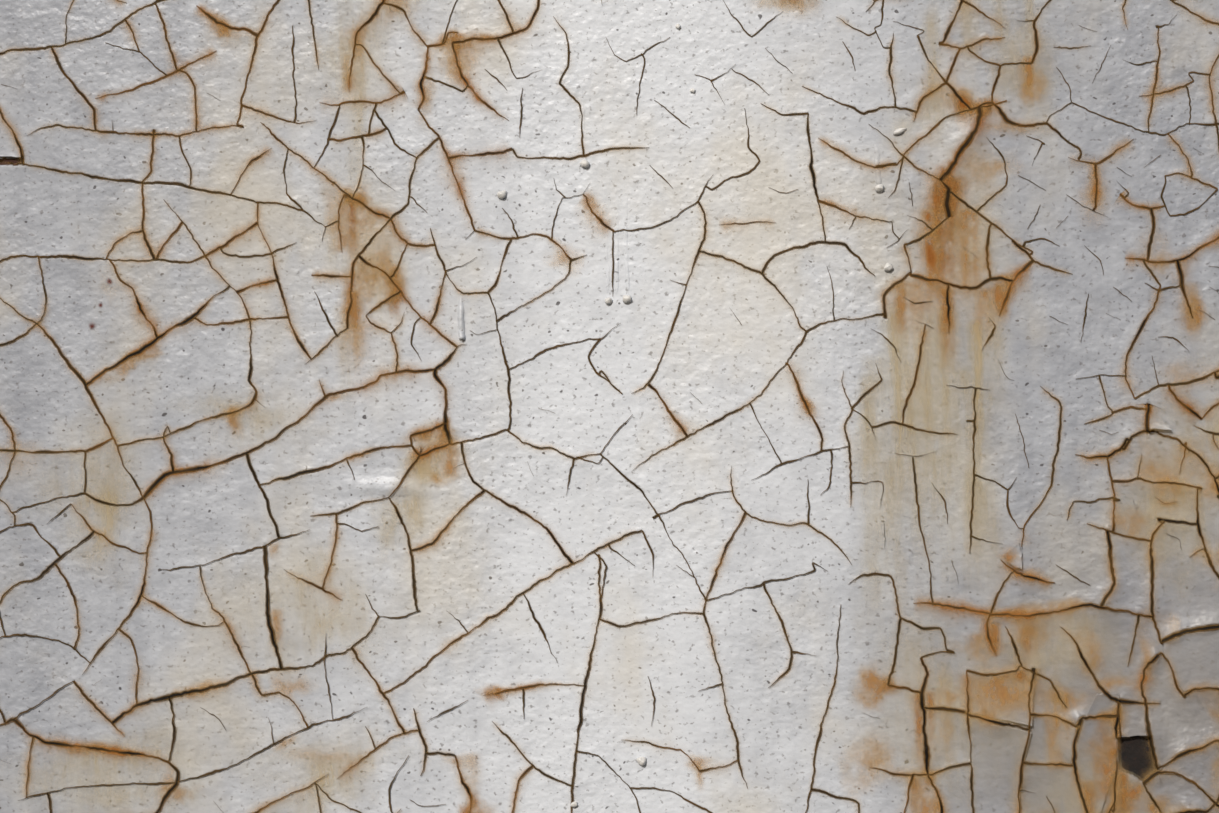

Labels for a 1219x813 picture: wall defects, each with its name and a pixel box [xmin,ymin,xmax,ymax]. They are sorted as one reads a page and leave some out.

peeling [0,122,25,166]
crack [583,103,1071,499]
rust [897,285,914,320]
rust [923,169,976,336]
crack [0,0,860,813]
crack [850,573,1219,813]
rust [1084,743,1142,811]
peeling [1076,693,1219,813]
peeling [1163,629,1219,692]